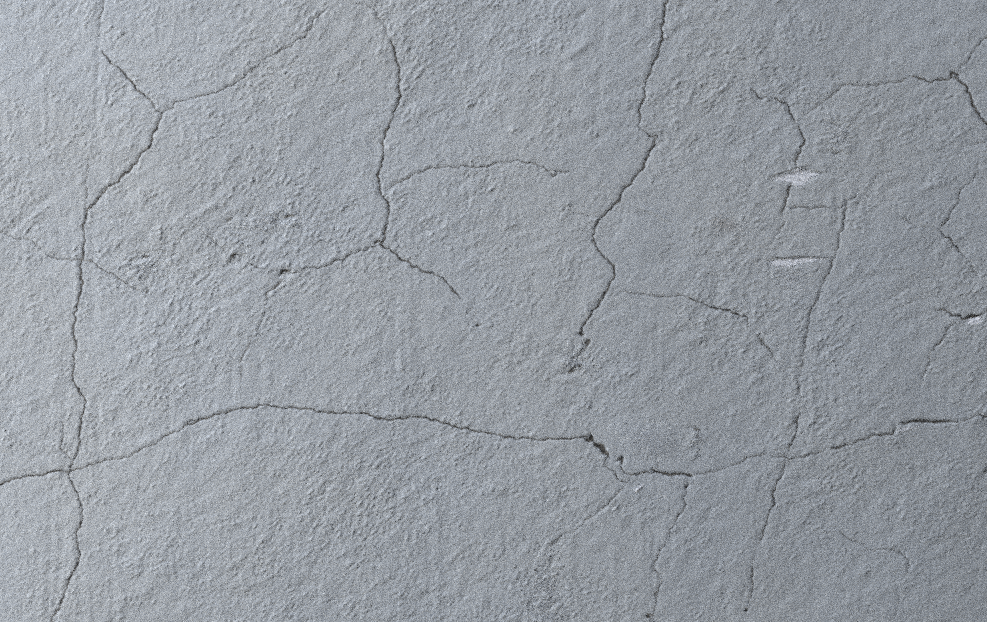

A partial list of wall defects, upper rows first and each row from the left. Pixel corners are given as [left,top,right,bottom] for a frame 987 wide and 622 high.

crack [751,37,987,164]
crack [0,3,692,622]
crack [573,0,780,366]
spalling [766,256,826,267]
spalling [774,165,819,186]
crack [797,293,820,398]
crack [773,171,894,280]
crack [906,177,978,280]
crack [922,309,987,382]
crack [699,412,956,592]